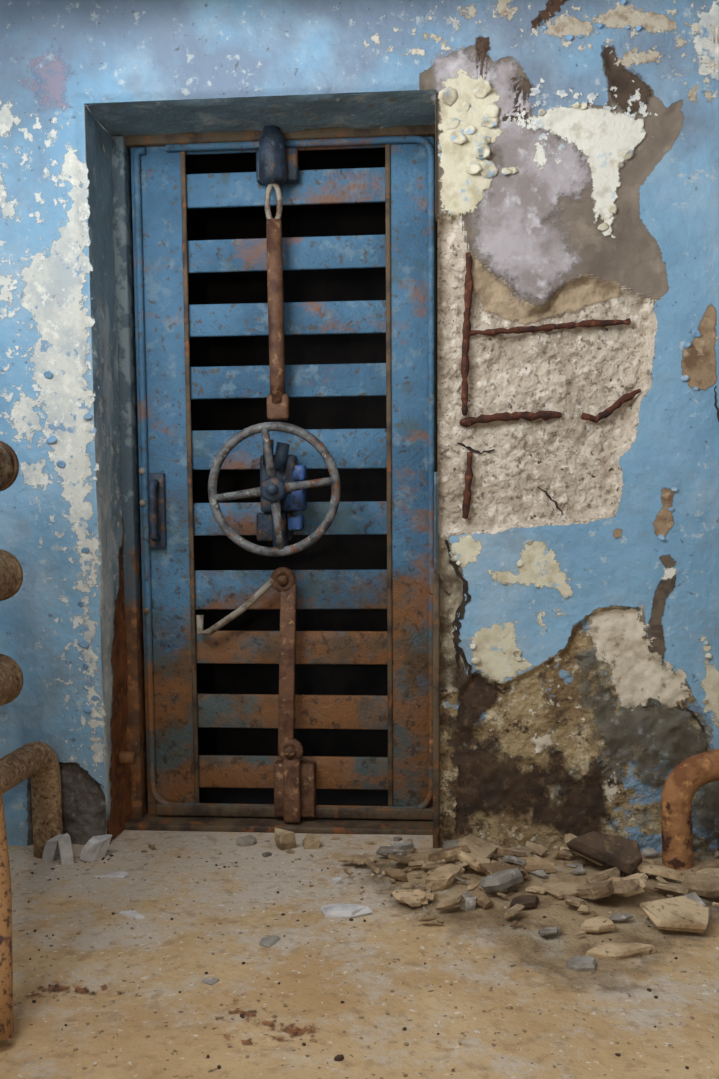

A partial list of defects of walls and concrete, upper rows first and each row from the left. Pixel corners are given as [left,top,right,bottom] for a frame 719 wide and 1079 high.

peeling [0,56,111,845]
spalling [363,0,719,853]
water stain [443,654,709,839]
crack [711,386,719,422]